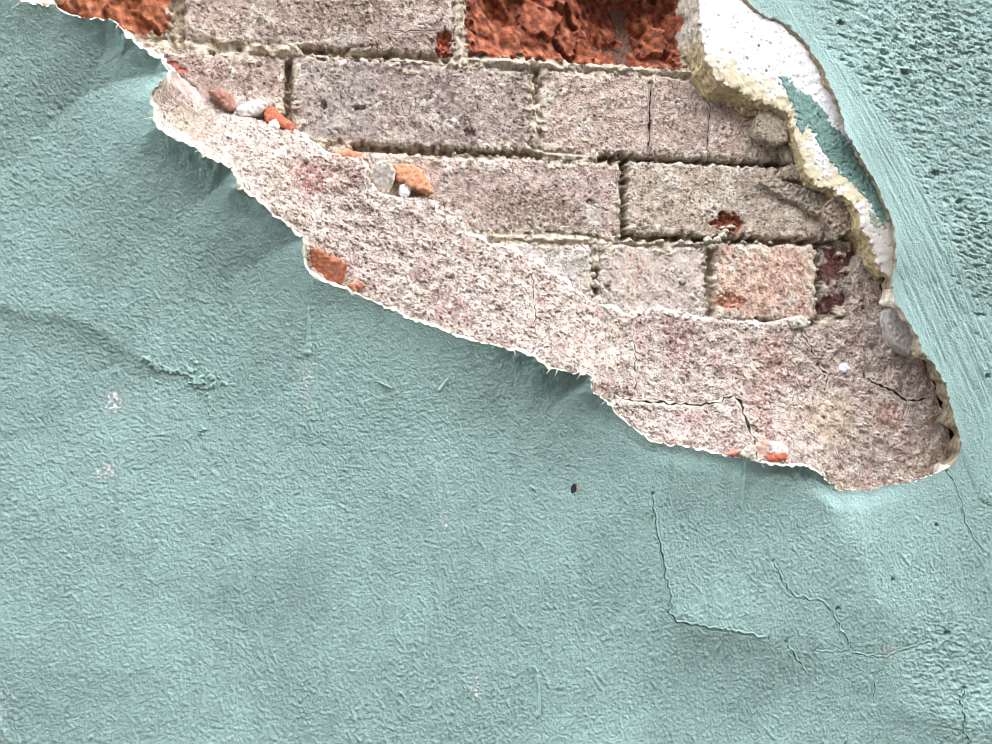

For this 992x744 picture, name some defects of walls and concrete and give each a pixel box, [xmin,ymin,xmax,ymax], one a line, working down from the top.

flaking render [14,0,962,492]
crack [650,494,933,702]
crack [945,452,992,553]